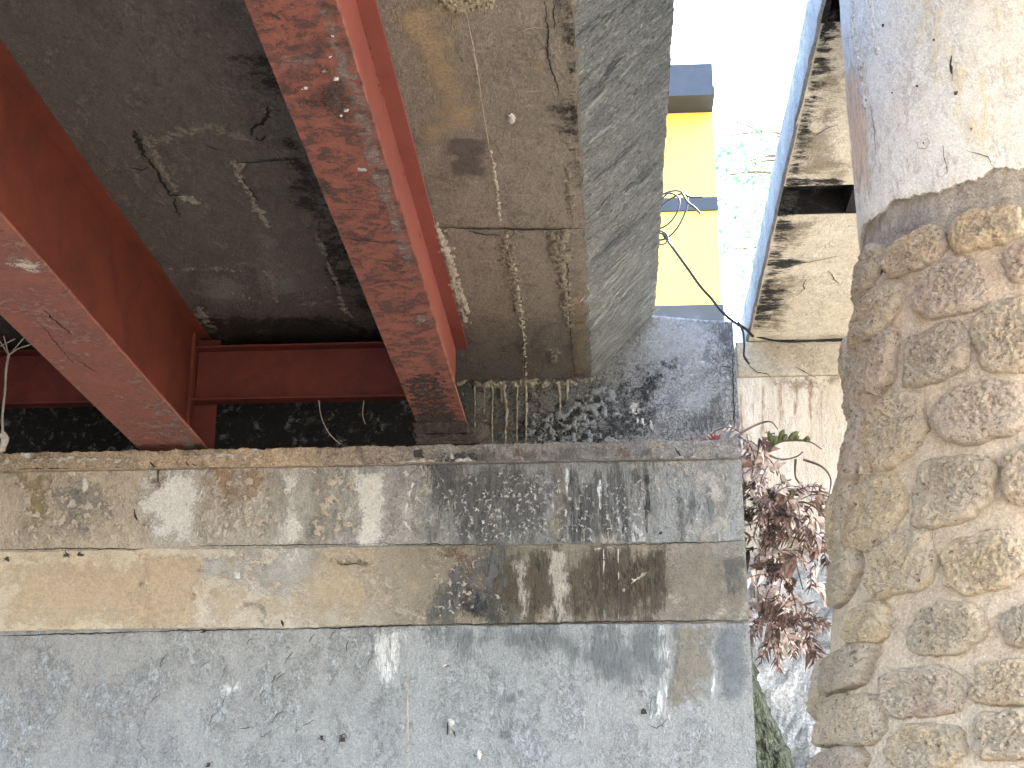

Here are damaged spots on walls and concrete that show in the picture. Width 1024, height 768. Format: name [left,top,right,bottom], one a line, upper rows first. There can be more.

crack [127,130,201,217]
crack [206,107,305,202]
water stain [394,3,486,176]
crack [437,0,583,236]
water stain [753,10,845,332]
water stain [6,214,750,706]
corrosion [398,372,458,423]
peeling [513,374,658,444]